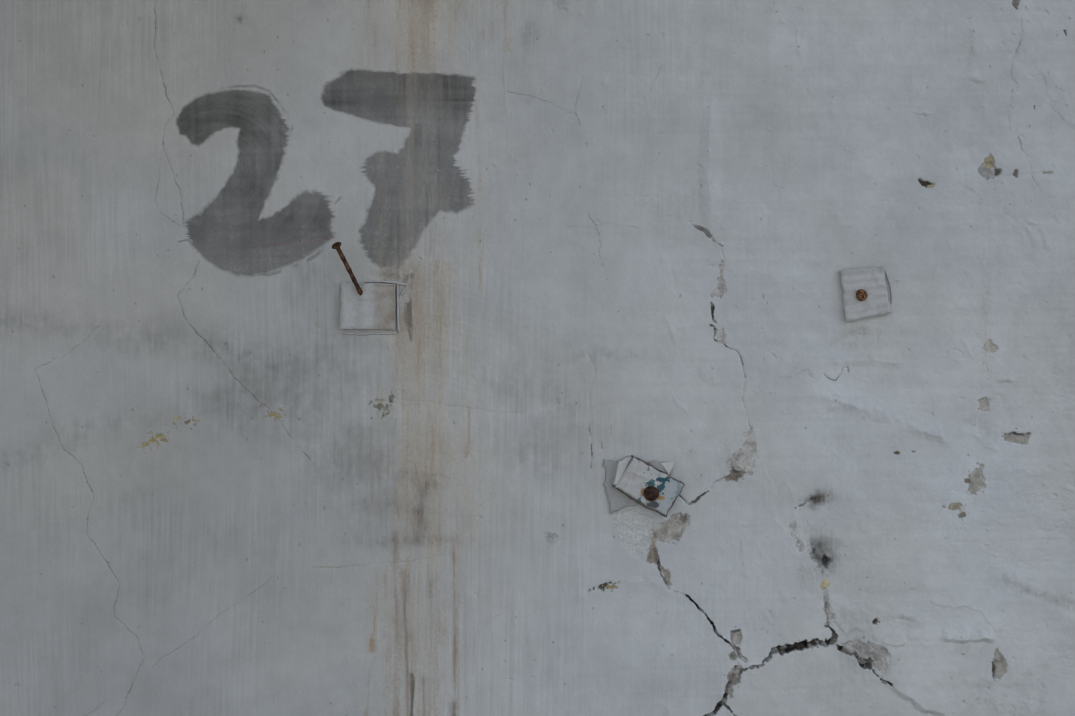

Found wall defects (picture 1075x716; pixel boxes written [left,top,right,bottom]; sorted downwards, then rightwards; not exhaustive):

peeling [978,154,1018,180]
crack [710,302,744,365]
peeling [370,395,396,420]
flaking render [724,428,756,482]
crack [679,490,709,505]
peeling [942,463,985,521]
flaking render [647,513,690,586]
crack [656,554,893,716]
peeling [992,649,1007,681]